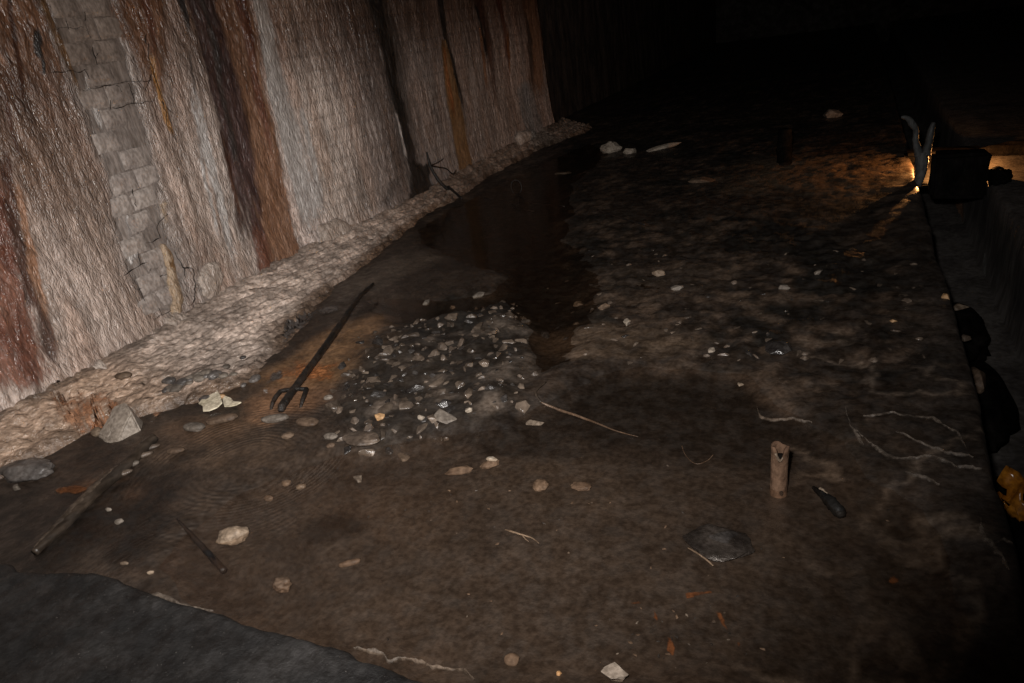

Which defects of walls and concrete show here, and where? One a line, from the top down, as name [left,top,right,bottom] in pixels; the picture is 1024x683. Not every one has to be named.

rust [0,0,78,100]
rust [213,0,299,271]
rust [438,0,472,169]
rust [0,100,56,387]
crack [125,214,196,319]